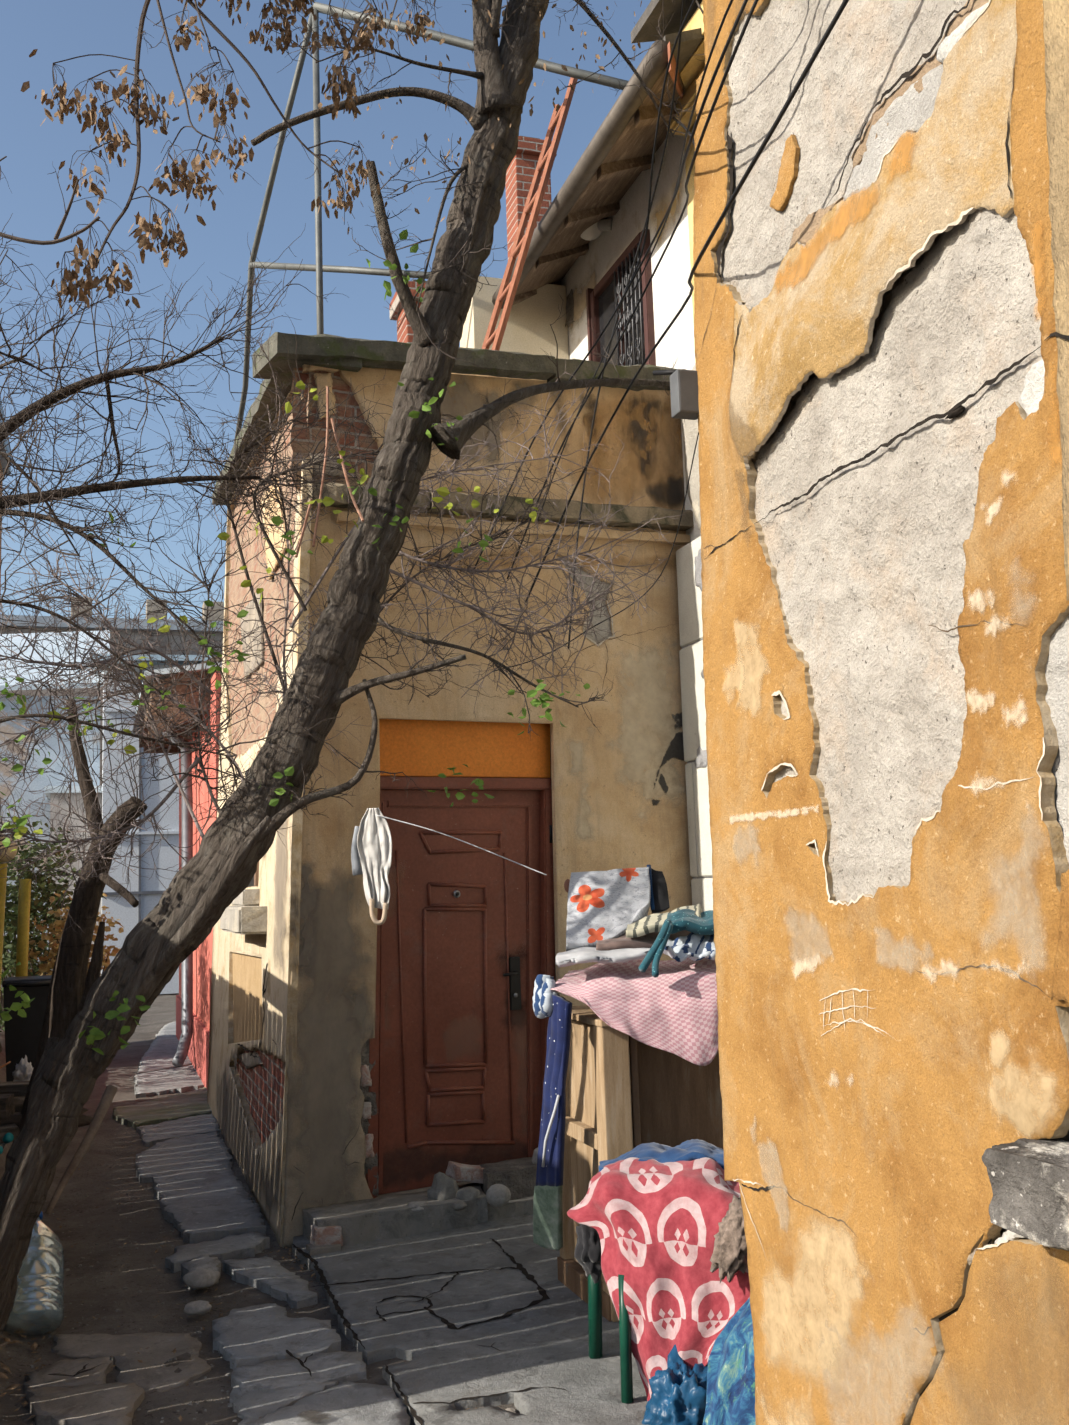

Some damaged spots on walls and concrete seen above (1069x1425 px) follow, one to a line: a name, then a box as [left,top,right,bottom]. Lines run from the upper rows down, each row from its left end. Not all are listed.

spalling [716,0,991,308]
crack [1005,57,1016,196]
damp [629,398,685,506]
spalling [723,207,1045,906]
spalling [1036,614,1069,863]
spalling [230,1050,286,1158]
crack [734,1179,857,1257]
spalling [994,1229,1028,1244]
crack [910,1239,1008,1423]